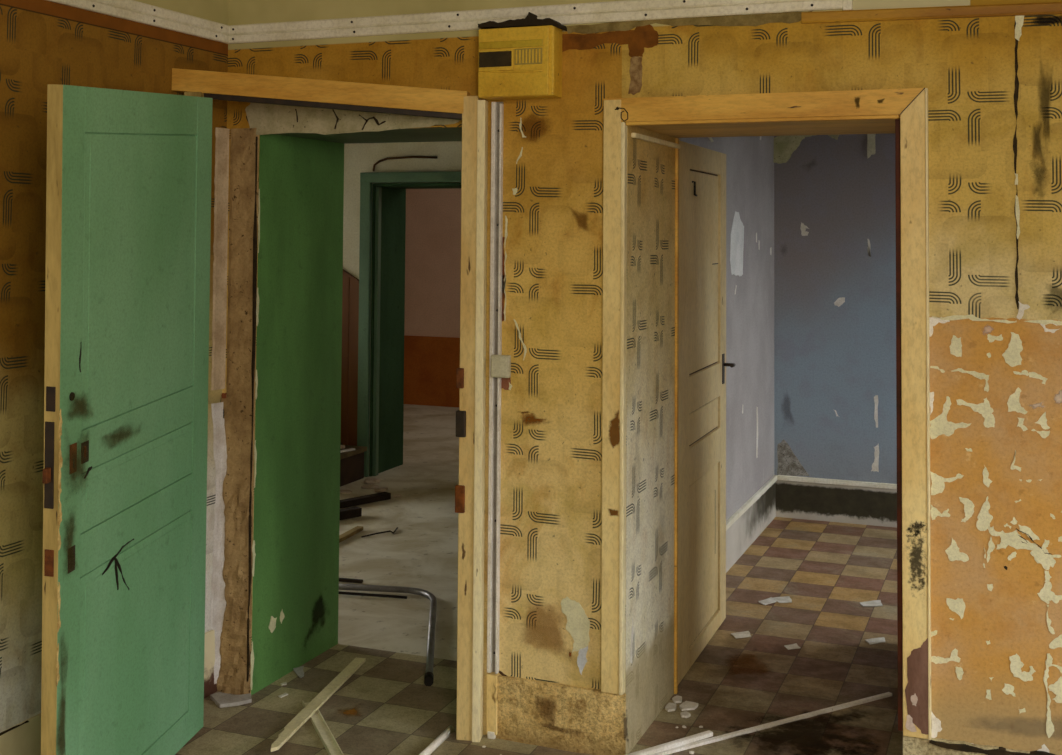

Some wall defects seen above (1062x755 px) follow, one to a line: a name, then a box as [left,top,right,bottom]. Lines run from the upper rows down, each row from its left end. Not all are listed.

peeling [730,211,772,295]
peeling [929,301,1062,439]
peeling [871,444,879,472]
damp [907,522,925,590]
peeling [561,597,590,675]
peeling [930,465,1062,753]